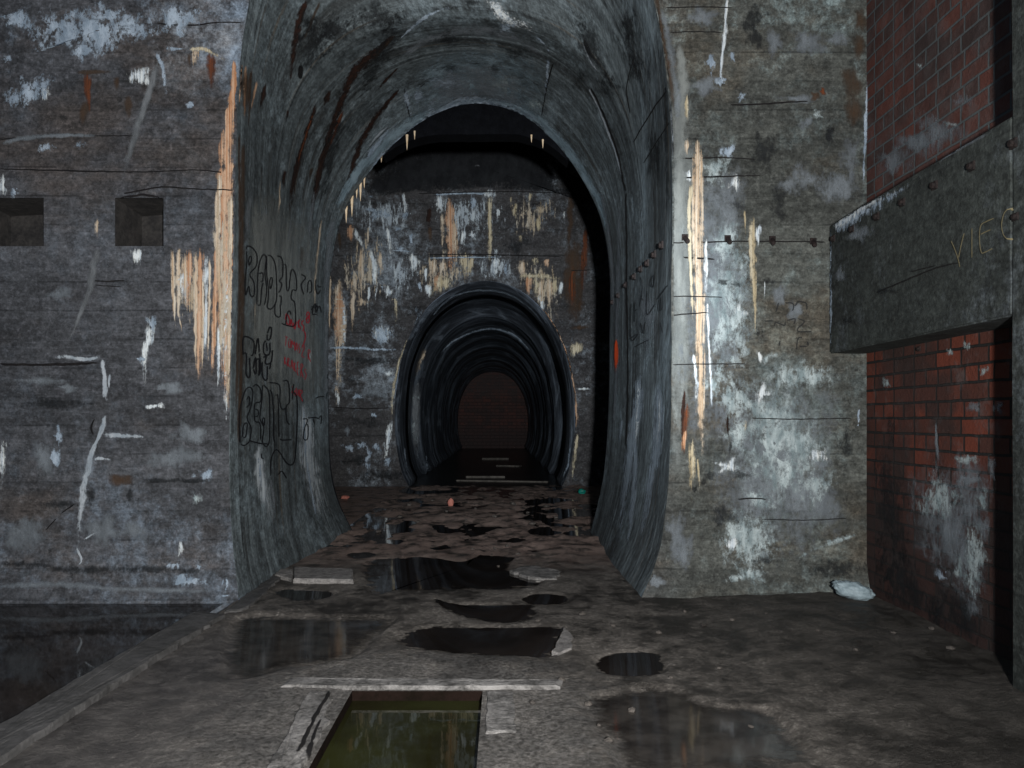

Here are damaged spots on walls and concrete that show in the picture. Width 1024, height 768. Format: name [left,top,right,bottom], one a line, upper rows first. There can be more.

water stain [0,1,201,161]
corrosion [290,0,320,80]
corrosion [278,36,399,215]
efflorescence [827,90,867,199]
water stain [613,0,838,582]